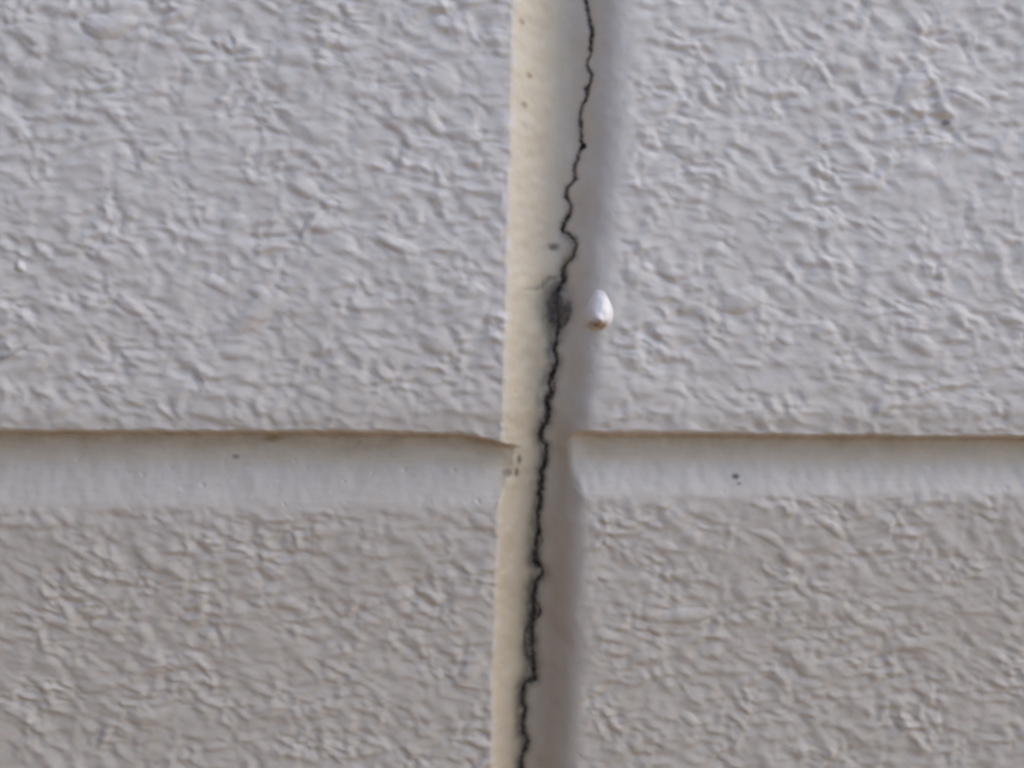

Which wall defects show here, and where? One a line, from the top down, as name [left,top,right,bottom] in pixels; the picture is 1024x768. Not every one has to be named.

crack [556,0,594,294]
crack [517,318,568,768]